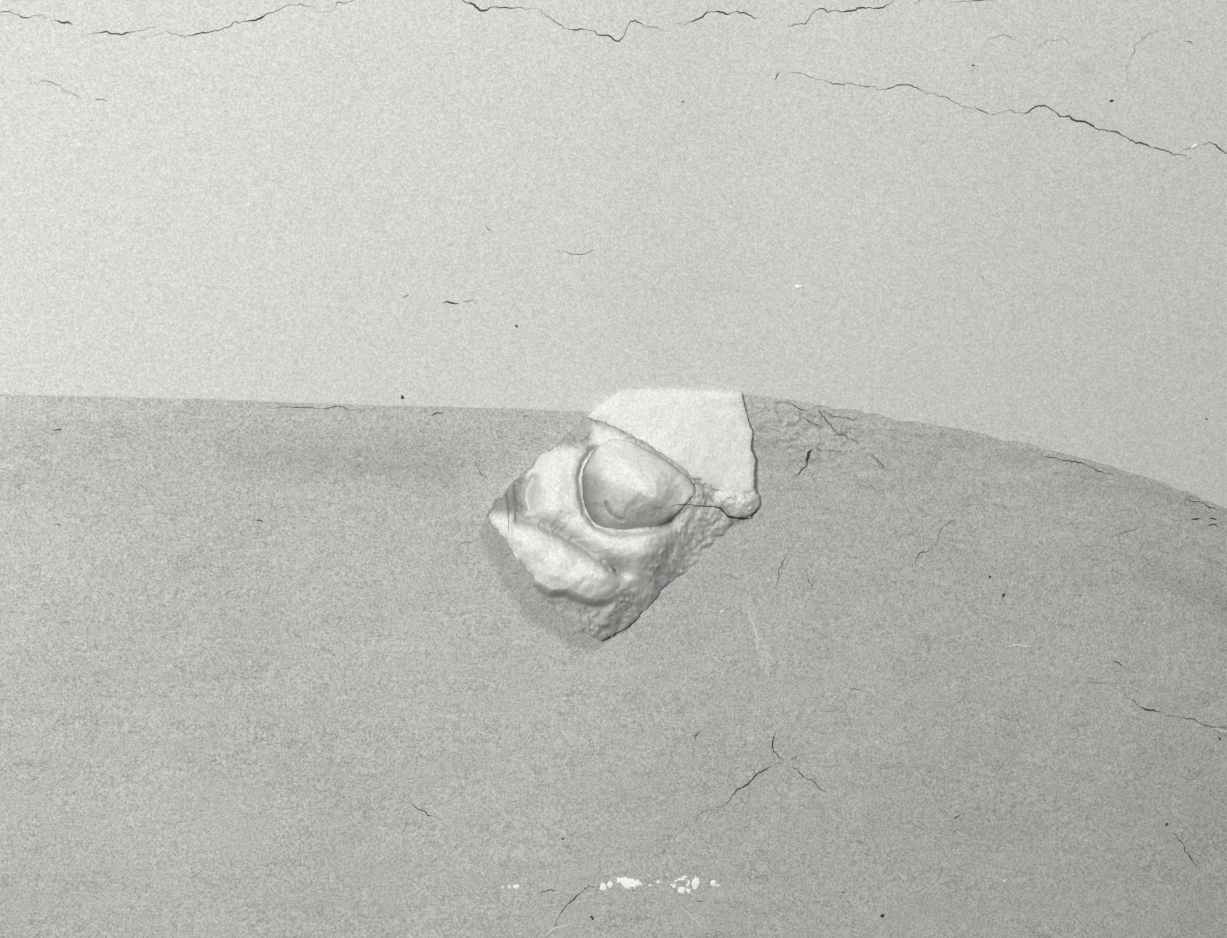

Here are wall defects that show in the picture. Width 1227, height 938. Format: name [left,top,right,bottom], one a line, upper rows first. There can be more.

crack [3,0,353,37]
crack [463,0,763,42]
crack [791,0,920,26]
crack [775,72,1227,159]
crack [797,447,836,475]
crack [694,732,825,823]